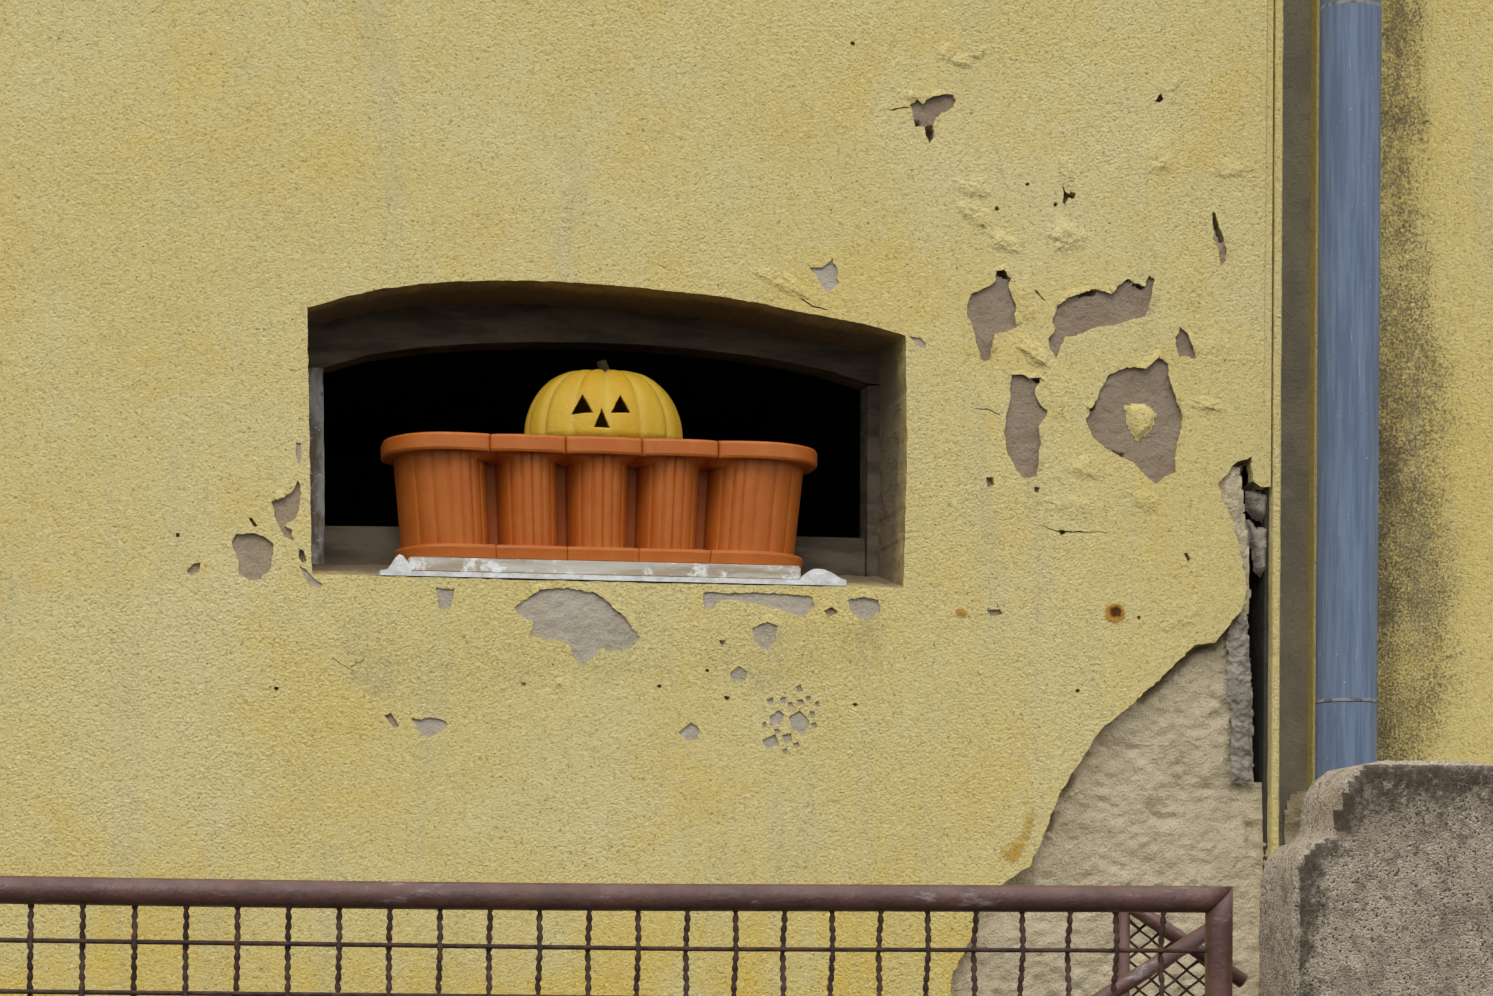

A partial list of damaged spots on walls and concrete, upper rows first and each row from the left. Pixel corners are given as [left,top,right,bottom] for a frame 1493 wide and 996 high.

peeling [910,89,955,143]
peeling [967,264,1023,361]
peeling [1048,277,1160,357]
peeling [1004,370,1051,492]
peeling [1084,329,1200,484]
peeling [232,443,323,589]
crack [1243,466,1267,577]
leakage [1297,0,1493,996]
peeling [703,589,885,651]
corrosion [1106,604,1124,623]
flaking render [1003,459,1267,996]
flaking render [950,912,1205,996]